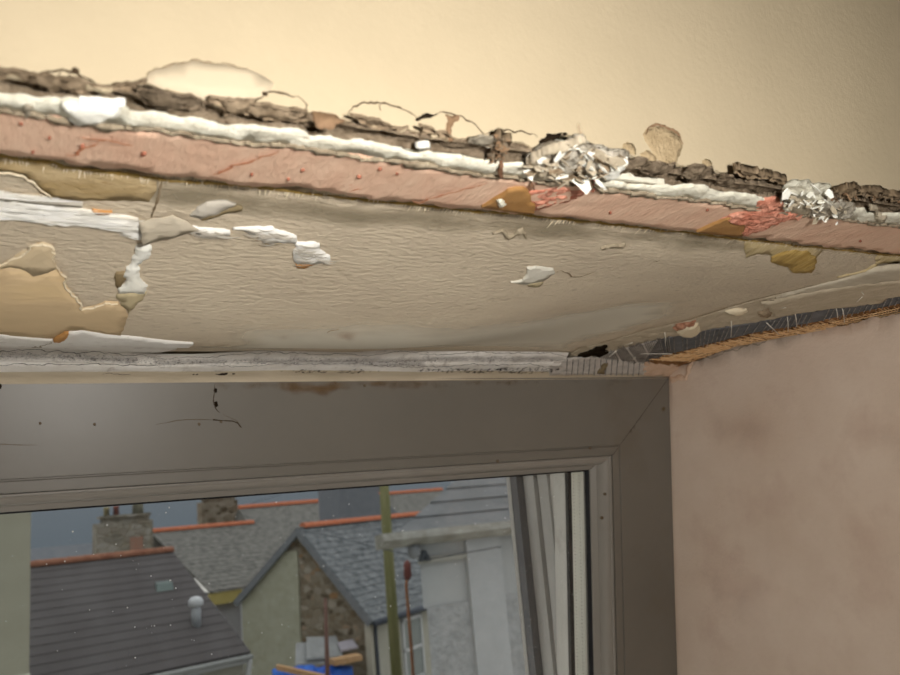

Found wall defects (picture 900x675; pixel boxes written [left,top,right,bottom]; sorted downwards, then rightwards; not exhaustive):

flaking render [0,67,535,164]
spalling [481,152,601,215]
flaking render [619,123,823,273]
flaking render [824,181,900,213]
peeling [0,330,193,354]